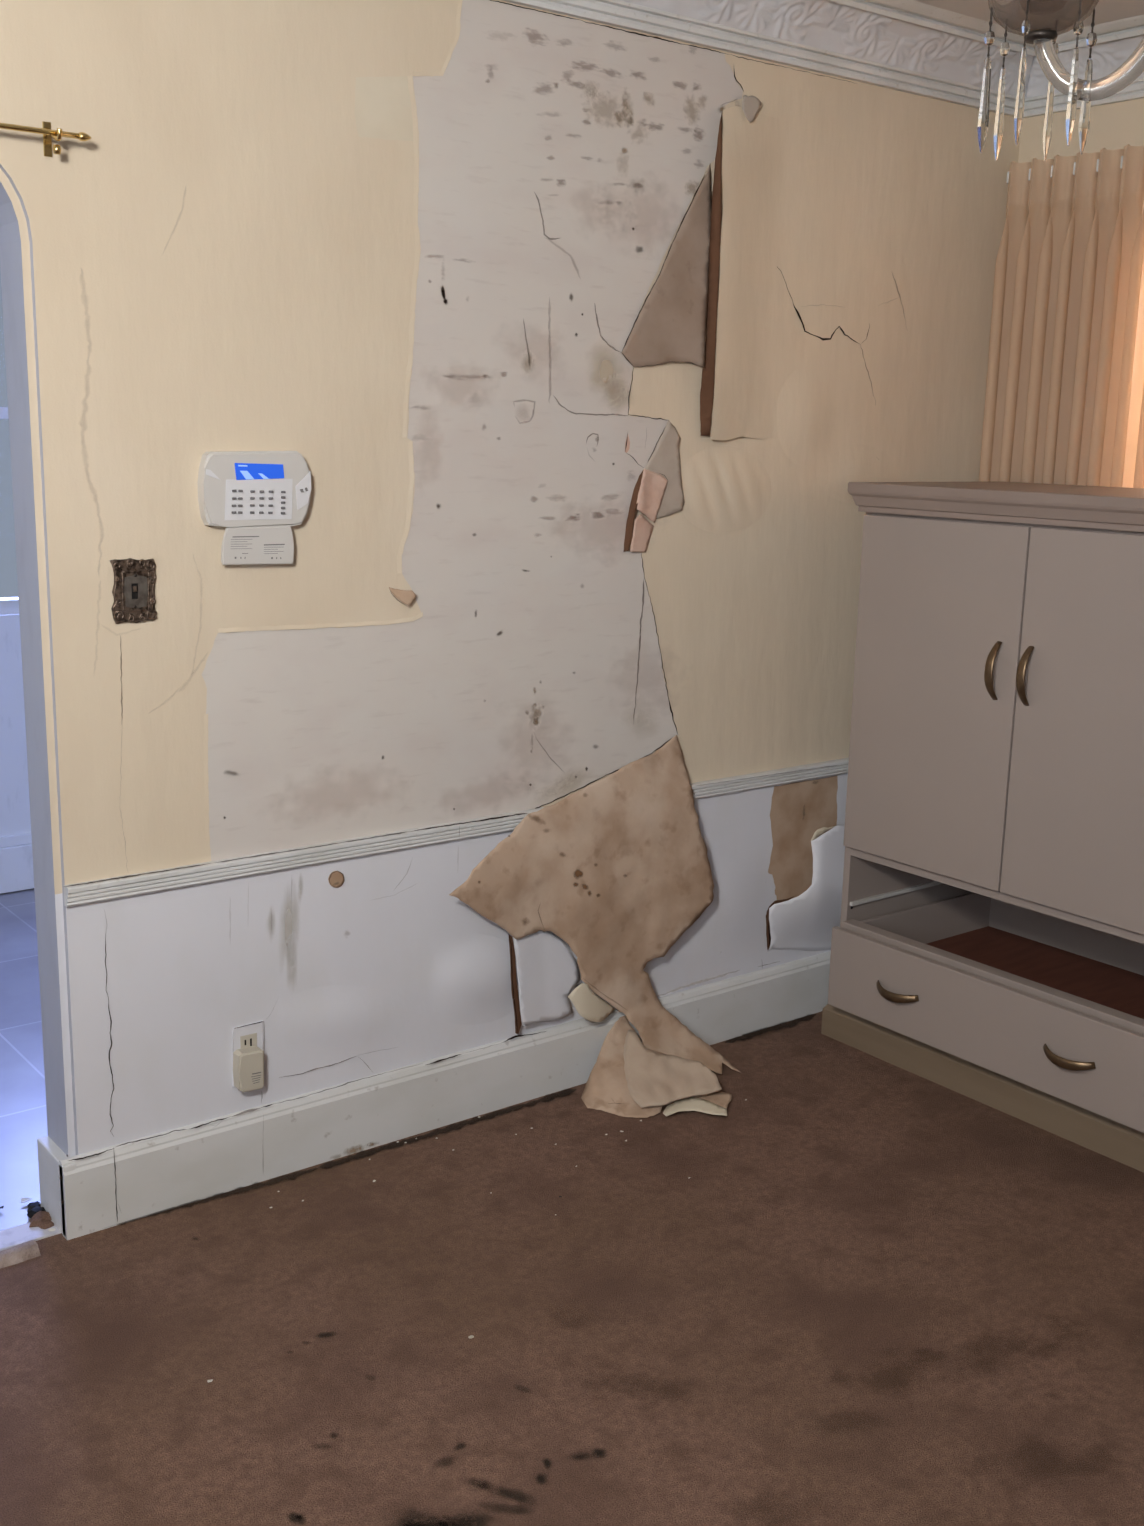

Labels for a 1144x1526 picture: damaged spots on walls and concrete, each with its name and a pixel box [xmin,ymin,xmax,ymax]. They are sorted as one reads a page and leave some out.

crack [777,267,876,404]
peeling [201,0,761,1074]
crack [117,636,125,713]
peeling [768,776,838,900]
crack [68,937,384,1222]
crack [502,1031,546,1043]